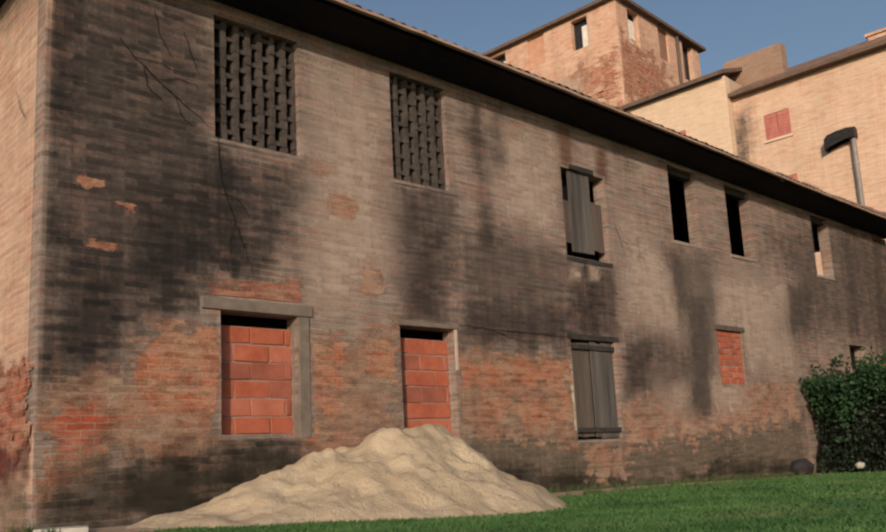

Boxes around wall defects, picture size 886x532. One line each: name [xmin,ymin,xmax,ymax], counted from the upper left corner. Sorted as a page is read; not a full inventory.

spalling [564,22,674,107]
spalling [76,173,106,189]
spalling [87,238,119,251]
spalling [0,310,227,519]
water stain [39,0,297,371]
water stain [43,439,300,528]
crack [120,9,254,274]
flaking render [206,96,388,303]
spalling [288,305,404,457]
water stain [399,197,453,315]
water stain [466,217,569,342]
water stain [674,258,716,415]